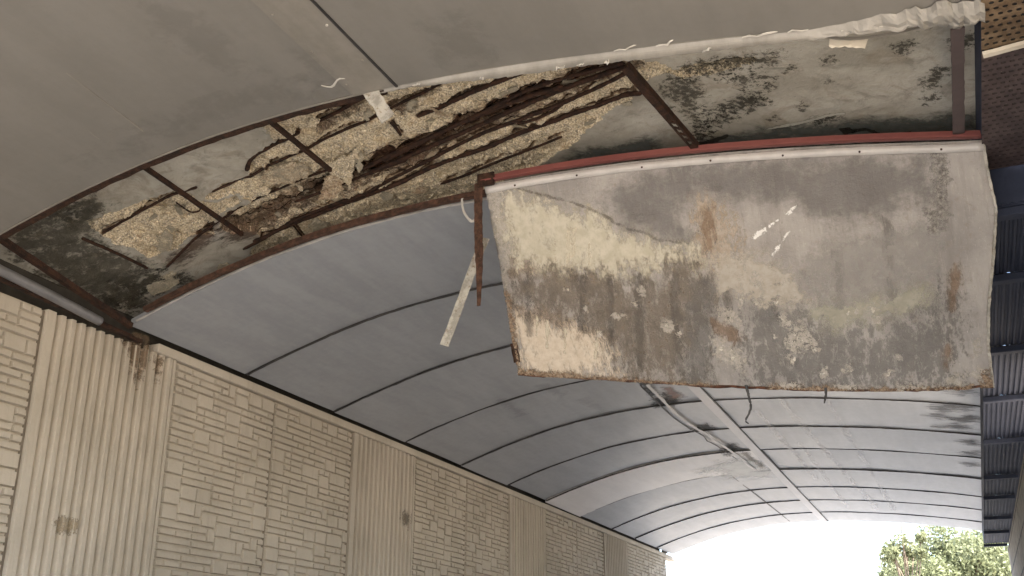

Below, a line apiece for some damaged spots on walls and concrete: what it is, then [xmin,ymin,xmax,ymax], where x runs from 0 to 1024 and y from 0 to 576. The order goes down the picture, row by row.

mould [890,38,919,59]
mould [8,192,194,316]
rust [166,60,650,267]
spalling [81,45,757,296]
peeling [611,285,646,321]
peeling [660,319,682,338]
water stain [494,48,976,408]